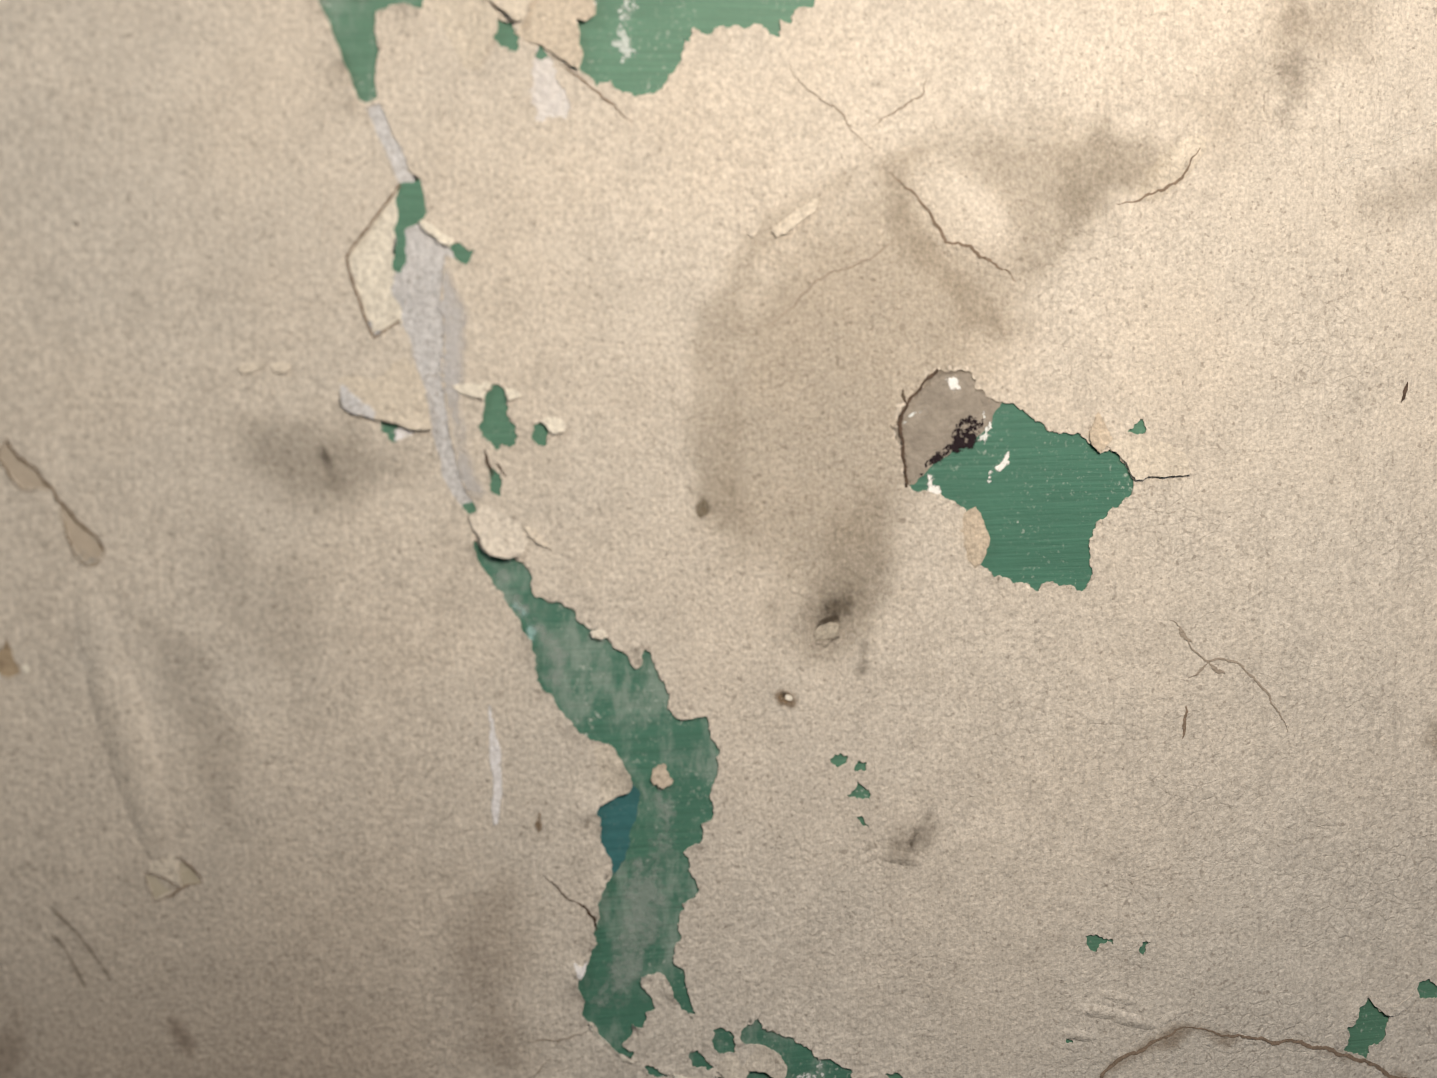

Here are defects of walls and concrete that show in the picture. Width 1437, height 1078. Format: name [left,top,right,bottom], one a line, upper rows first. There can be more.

crack [760,64,1015,327]
crack [1116,147,1201,205]
peeling [890,369,1191,591]
peeling [319,0,852,1078]
peeling [830,753,871,799]
crack [1100,1026,1416,1078]
peeling [1344,979,1437,1058]